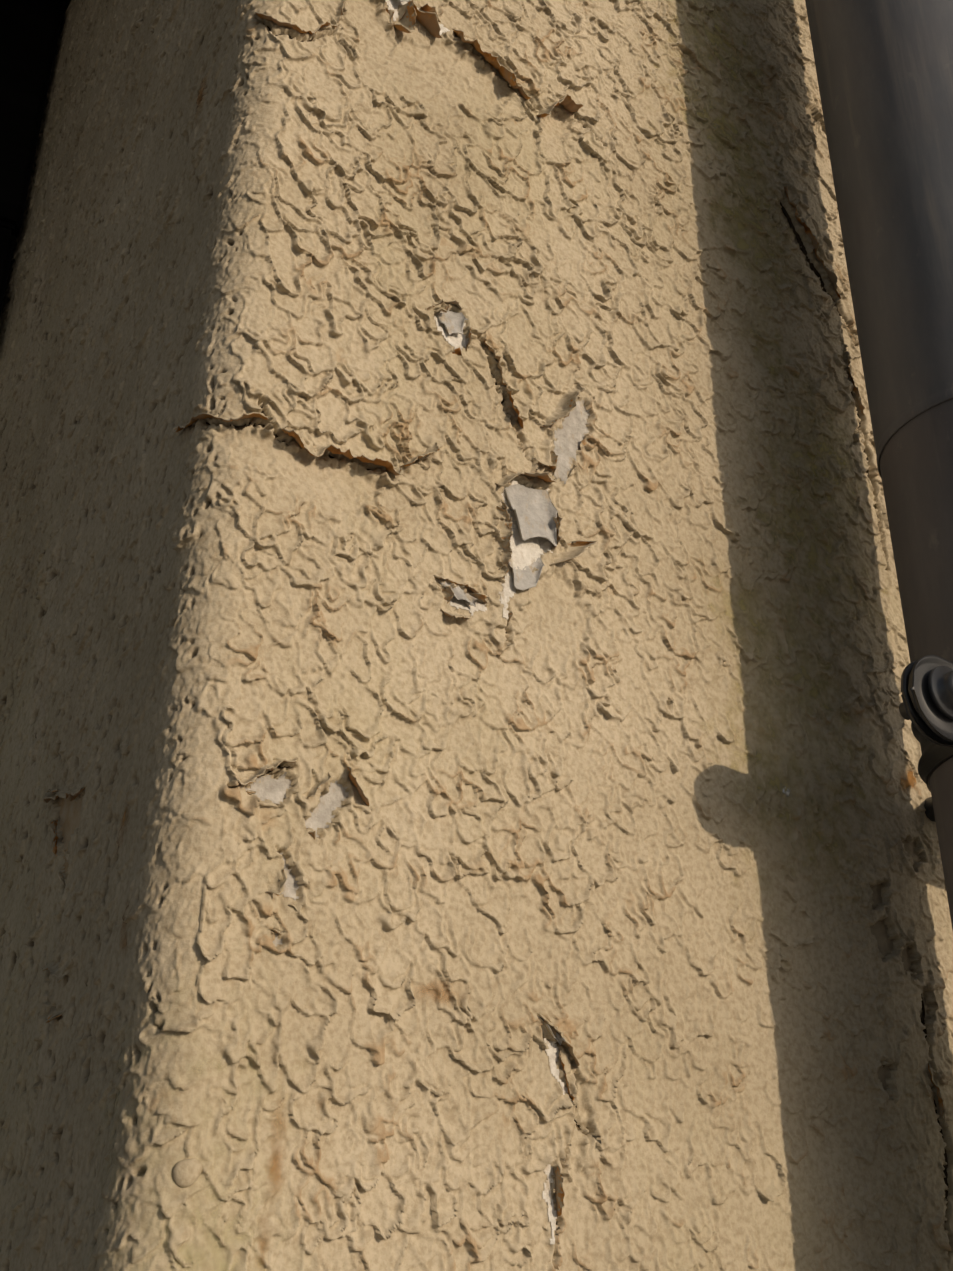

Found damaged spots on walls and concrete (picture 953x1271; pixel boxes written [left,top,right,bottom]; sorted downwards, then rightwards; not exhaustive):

peeling [385,0,531,99]
peeling [425,299,473,357]
peeling [433,384,598,634]
crack [848,353,886,570]
peeling [231,757,299,804]
peeling [305,766,370,840]
peeling [265,853,299,910]
crack [537,1013,587,1135]
crack [921,994,949,1252]
crack [542,1160,565,1244]